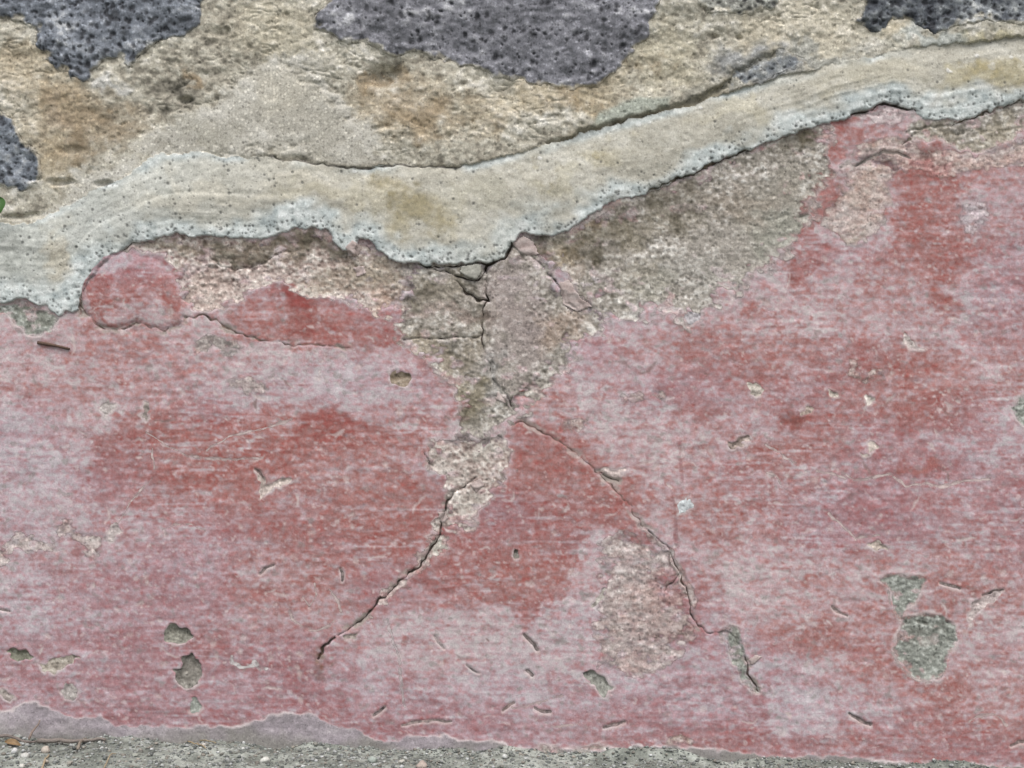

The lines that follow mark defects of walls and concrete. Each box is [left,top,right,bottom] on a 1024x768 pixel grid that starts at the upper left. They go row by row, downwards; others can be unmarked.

crack [268,155,471,170]
crack [648,149,749,191]
crack [850,102,916,116]
spalling [0,300,59,337]
crack [403,242,527,372]
spalling [121,100,1024,619]
peeling [164,623,202,713]
crack [317,477,476,660]
crack [507,396,713,634]
spalling [583,525,698,698]
spalling [718,625,761,693]
spalling [880,573,961,682]